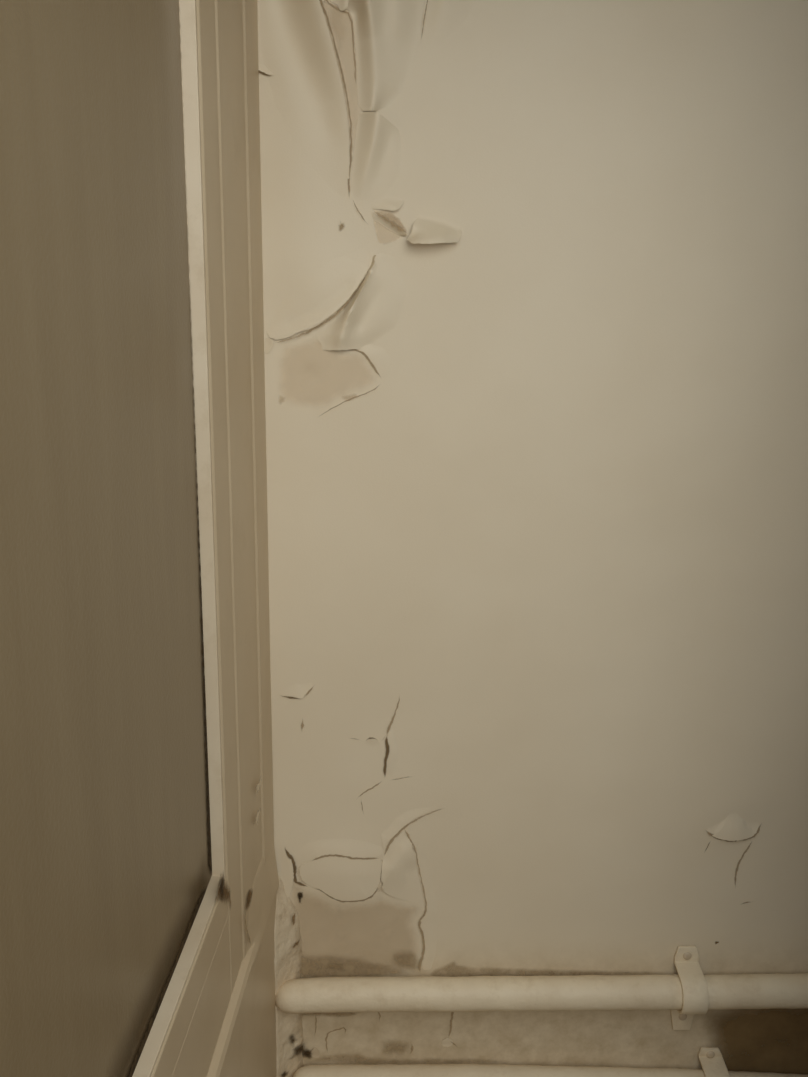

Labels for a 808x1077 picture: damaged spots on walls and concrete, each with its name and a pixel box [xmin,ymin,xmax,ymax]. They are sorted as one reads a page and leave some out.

peeling [259,0,475,221]
peeling [264,244,407,414]
crack [352,699,407,810]
spalling [279,807,441,970]
water stain [301,956,415,977]
water stain [291,1036,330,1059]
water stain [717,1008,808,1075]